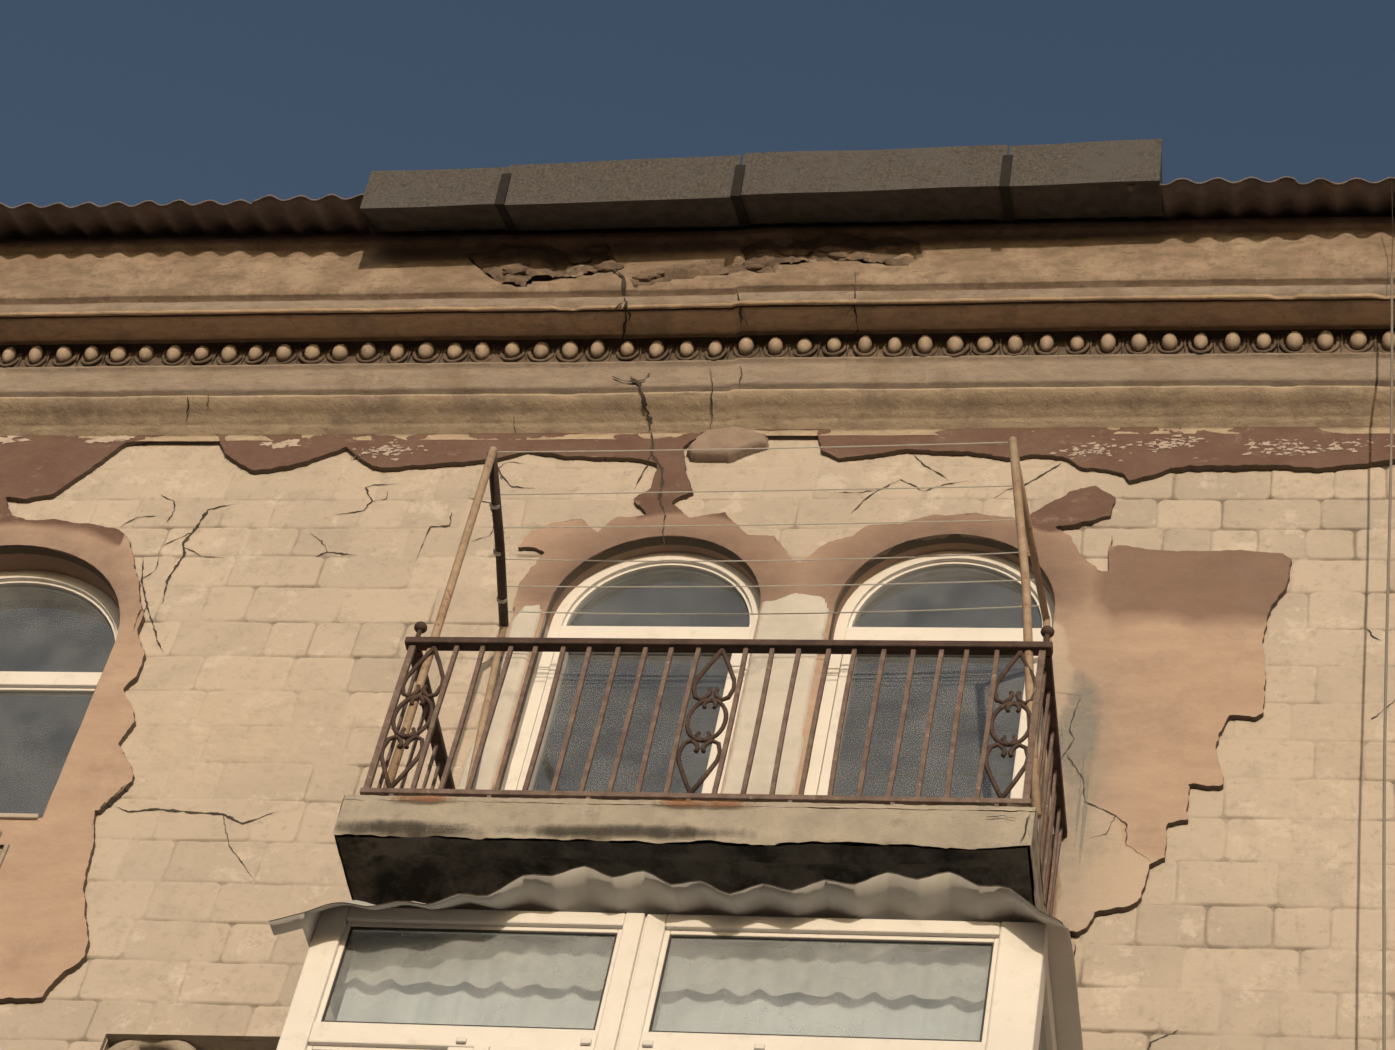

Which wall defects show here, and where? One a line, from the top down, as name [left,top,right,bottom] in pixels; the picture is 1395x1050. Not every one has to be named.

crack [604,243,631,340]
crack [736,290,748,326]
crack [709,366,742,426]
crack [613,373,666,546]
crack [122,494,232,648]
peeling [675,434,1395,1050]
crack [1060,692,1142,855]
water stain [337,820,465,833]
water stain [537,825,715,836]